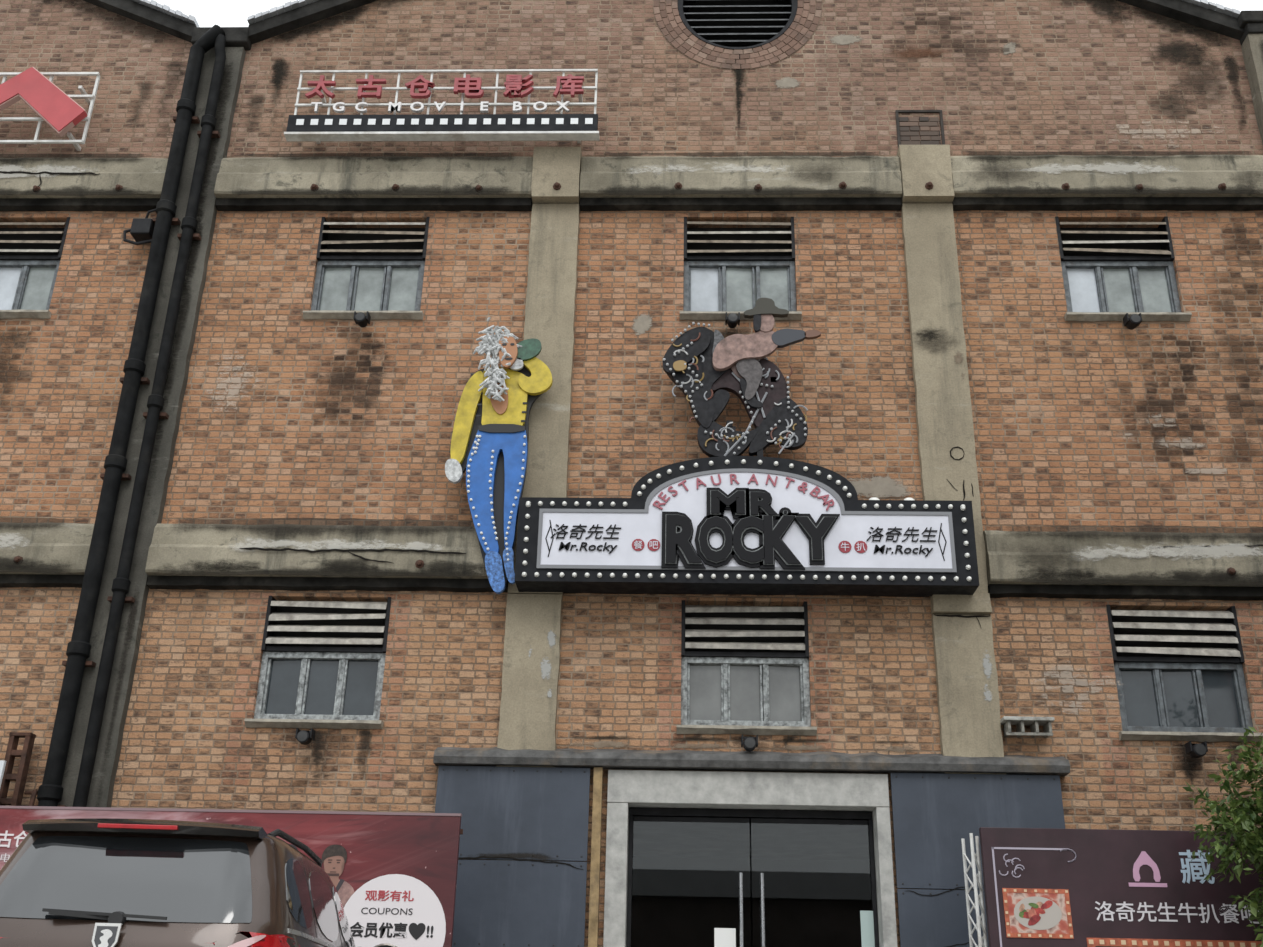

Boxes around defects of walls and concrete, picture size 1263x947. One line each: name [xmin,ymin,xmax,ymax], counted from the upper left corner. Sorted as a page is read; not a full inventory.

water stain [251,60,288,105]
water stain [735,54,744,126]
water stain [1085,0,1244,121]
crack [0,171,99,187]
crack [239,547,466,563]
crack [1150,542,1263,550]